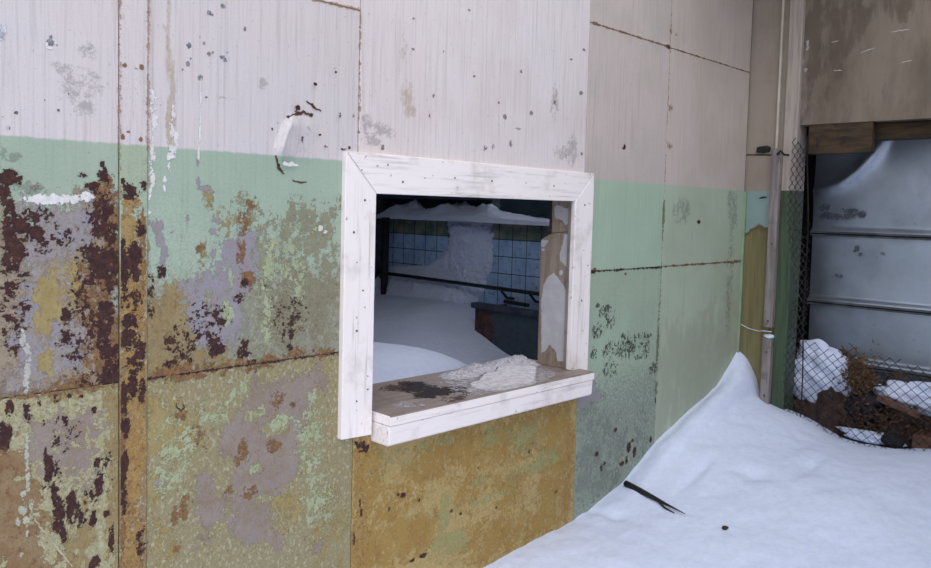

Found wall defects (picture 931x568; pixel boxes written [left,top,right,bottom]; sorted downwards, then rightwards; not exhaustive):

rust [592,22,748,73]
peeling [148,88,179,267]
peeling [0,183,118,568]
rust [0,0,339,568]
peeling [148,191,341,552]
peeling [541,205,568,362]
rust [591,260,741,275]